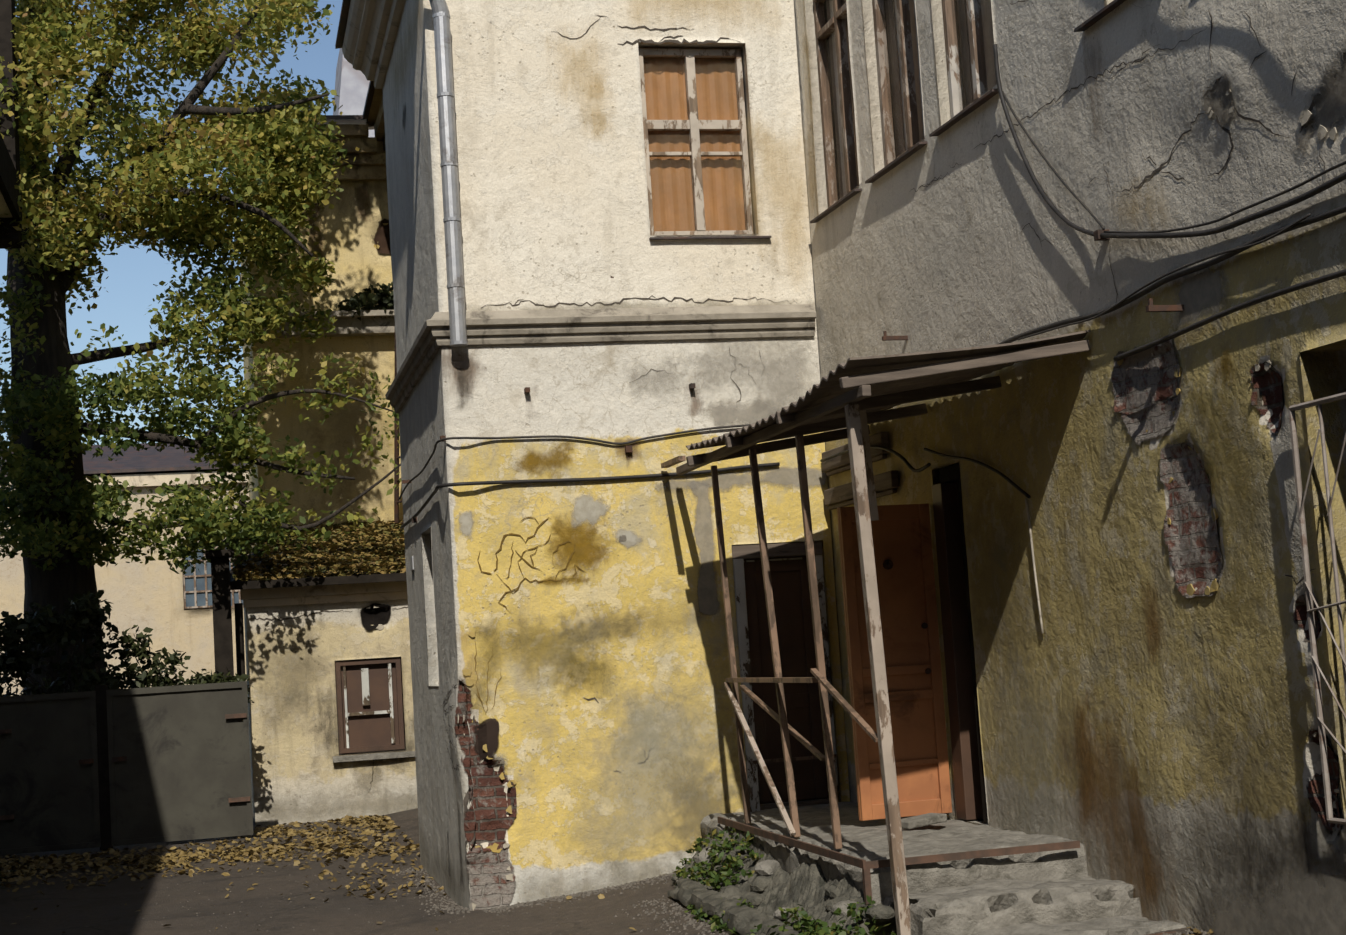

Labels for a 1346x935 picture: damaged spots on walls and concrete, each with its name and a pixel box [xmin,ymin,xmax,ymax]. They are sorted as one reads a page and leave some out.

crack [552,15,739,45]
crack [910,10,1289,192]
peeling [1297,52,1346,150]
crack [481,295,802,308]
spalling [1250,360,1285,434]
spalling [1111,341,1223,598]
crack [477,517,585,613]
water stain [543,520,605,584]
spalling [1285,569,1321,642]
crack [443,628,502,902]
spalling [454,669,517,911]
spalling [1306,729,1342,835]